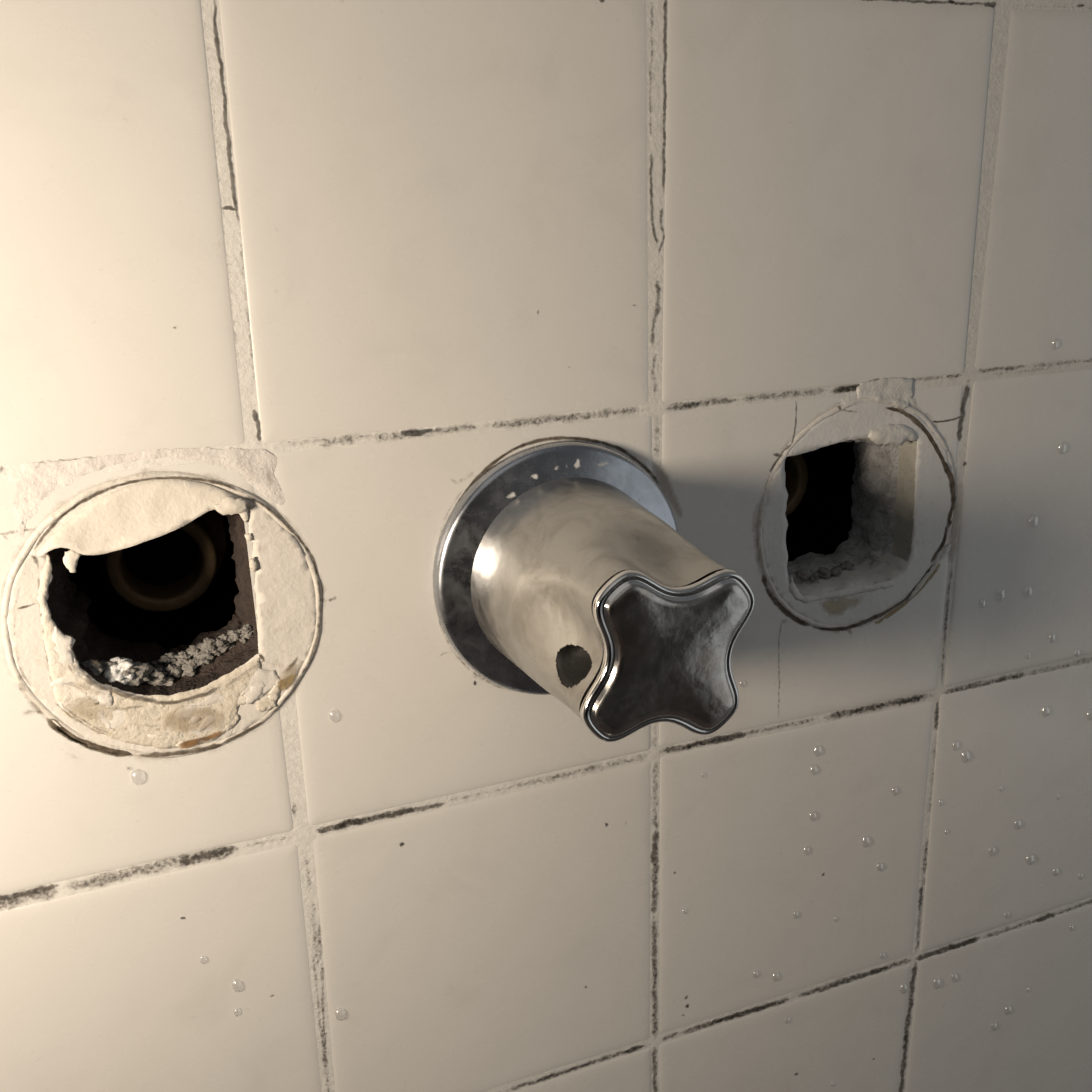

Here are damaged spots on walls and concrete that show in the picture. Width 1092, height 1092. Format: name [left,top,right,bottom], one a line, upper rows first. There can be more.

spalling [7,479,316,753]
spalling [762,377,966,626]
water stain [0,884,58,908]
water stain [80,847,233,886]